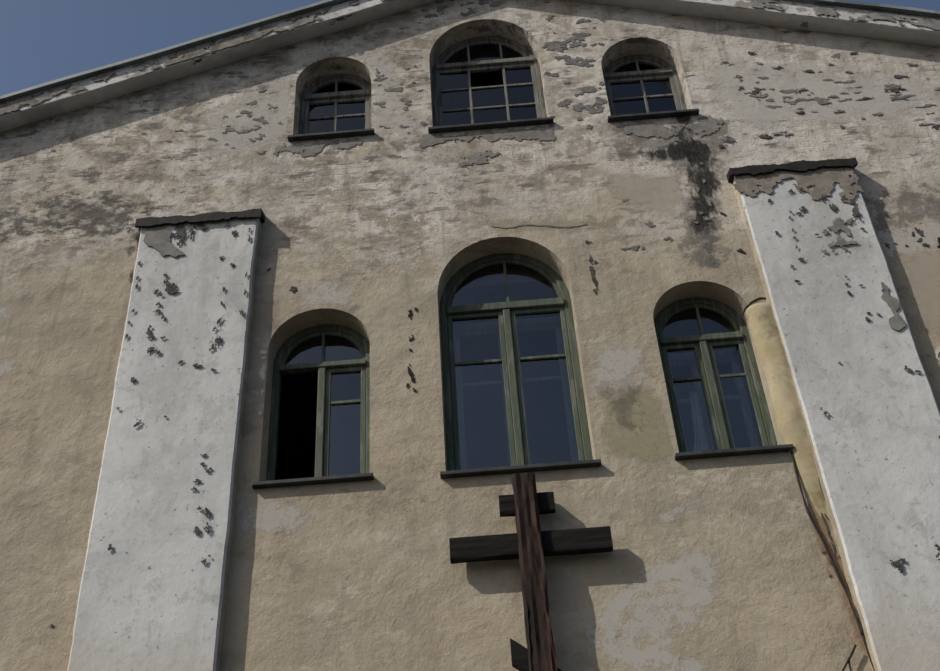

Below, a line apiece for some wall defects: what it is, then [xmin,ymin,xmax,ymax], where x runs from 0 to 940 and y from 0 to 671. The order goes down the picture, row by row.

flaking render [132,0,358,70]
flaking render [208,87,362,158]
flaking render [373,18,607,167]
flaking render [624,115,735,148]
flaking render [721,51,874,114]
flaking render [884,63,940,129]
damp [638,116,720,234]
damp [0,192,152,256]
peeling [143,223,208,257]
peeling [733,158,865,268]
flaking render [885,227,940,248]
peeling [865,282,906,331]